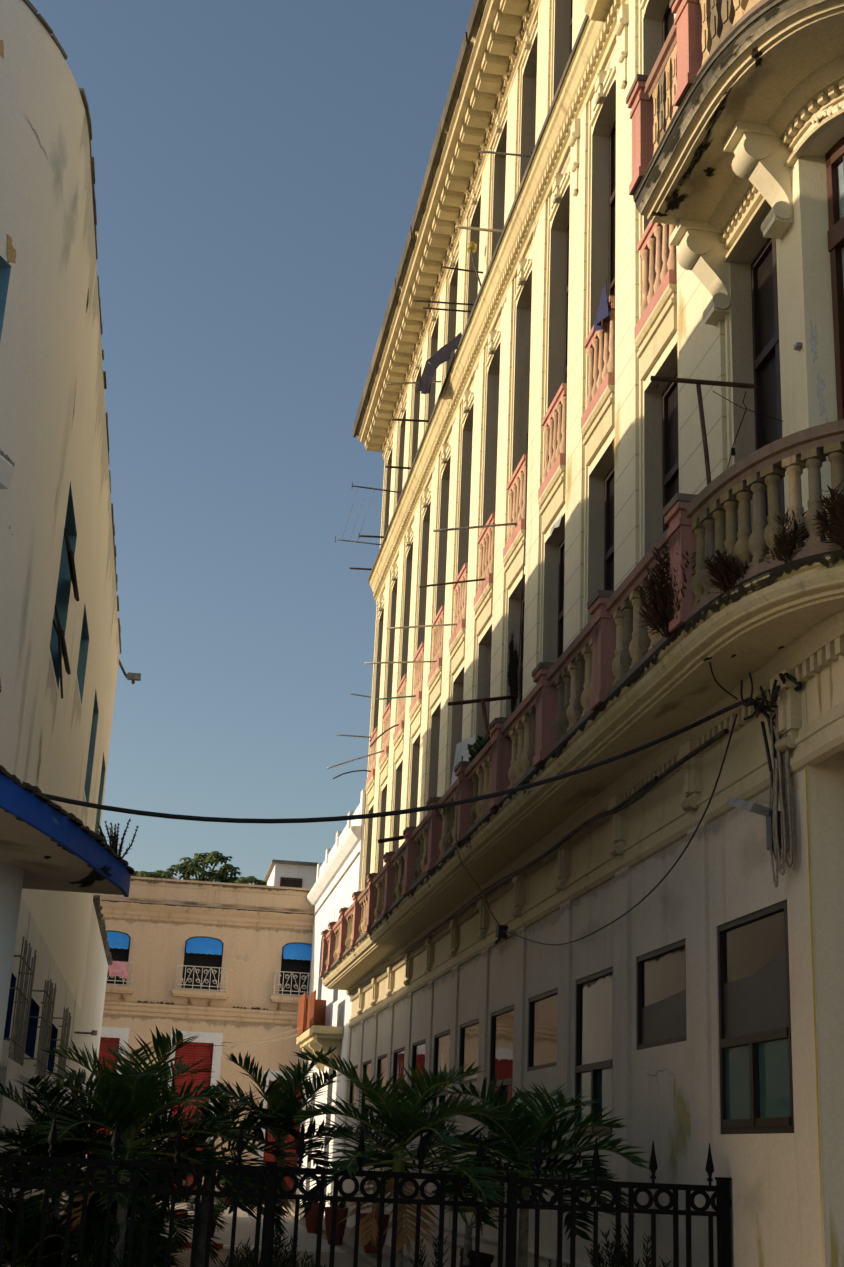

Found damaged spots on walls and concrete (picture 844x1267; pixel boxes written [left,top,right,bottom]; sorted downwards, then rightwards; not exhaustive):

peeling [6,234,16,263]